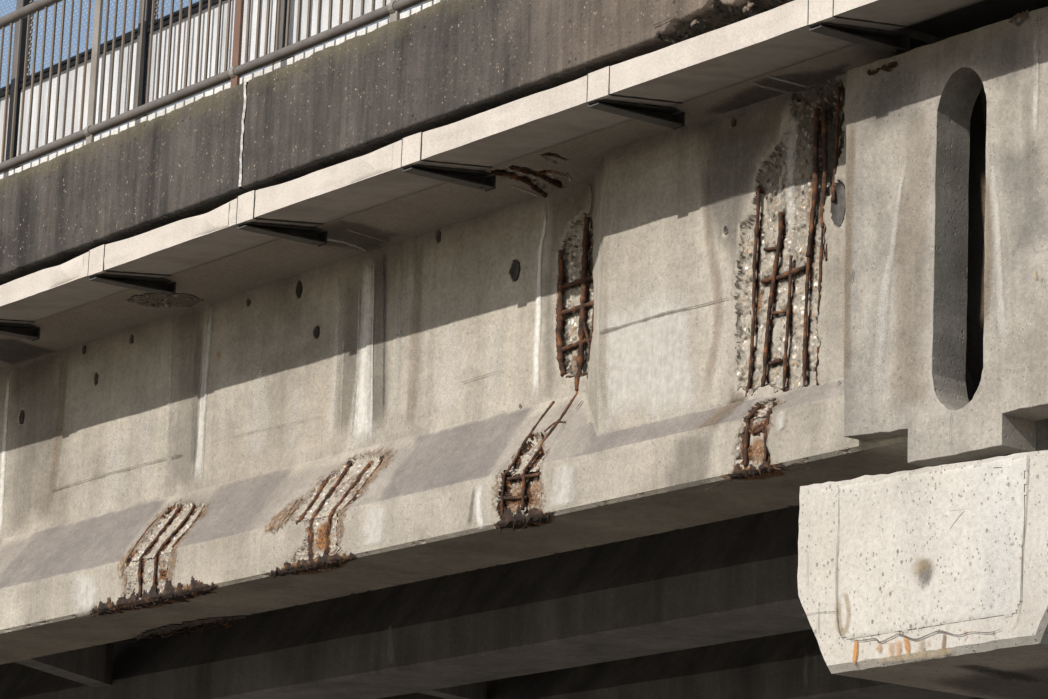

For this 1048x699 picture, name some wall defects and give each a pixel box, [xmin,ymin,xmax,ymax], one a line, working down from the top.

spalling [657,0,794,44]
spalling [491,152,572,198]
spalling [703,78,845,492]
spalling [492,213,594,534]
spalling [78,500,218,621]
spalling [268,448,394,579]